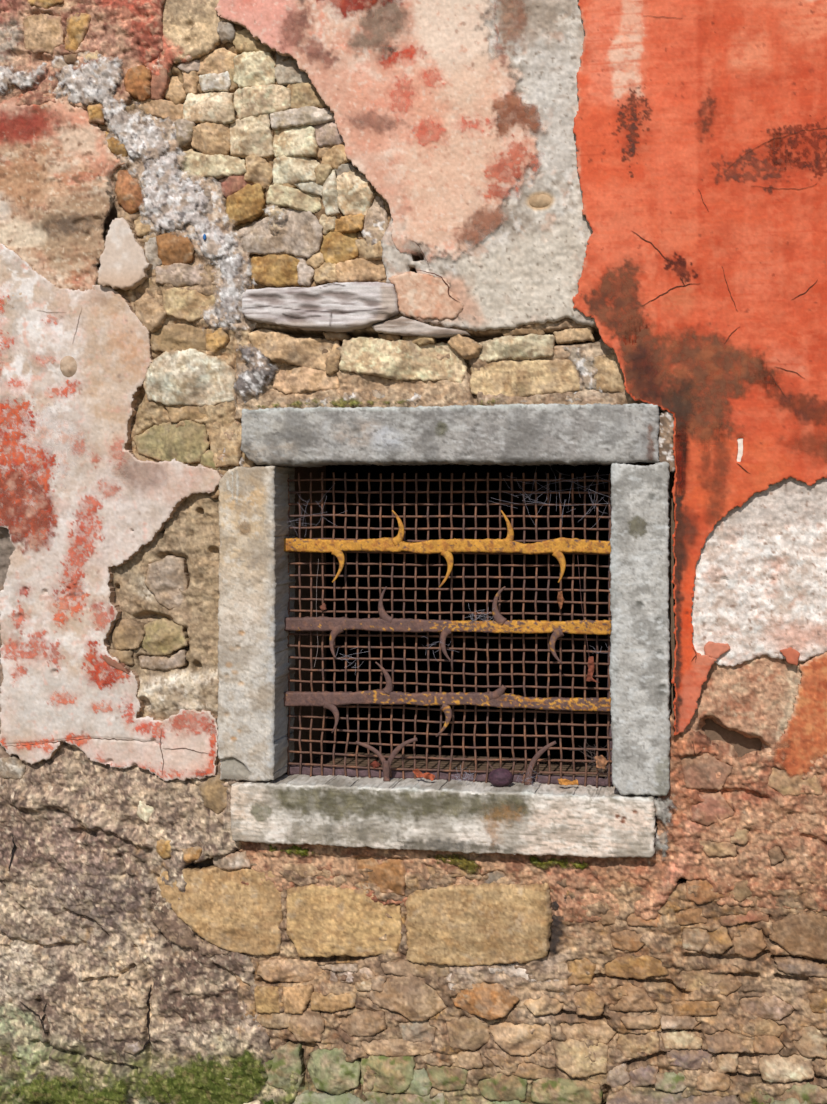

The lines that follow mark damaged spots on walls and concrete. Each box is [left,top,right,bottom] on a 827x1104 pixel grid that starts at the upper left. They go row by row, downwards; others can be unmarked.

flaking render [0,0,645,720]
leakage [612,87,652,177]
leakage [664,252,698,282]
leakage [584,260,827,731]
leakage [716,122,827,193]
flaking render [0,477,827,1104]